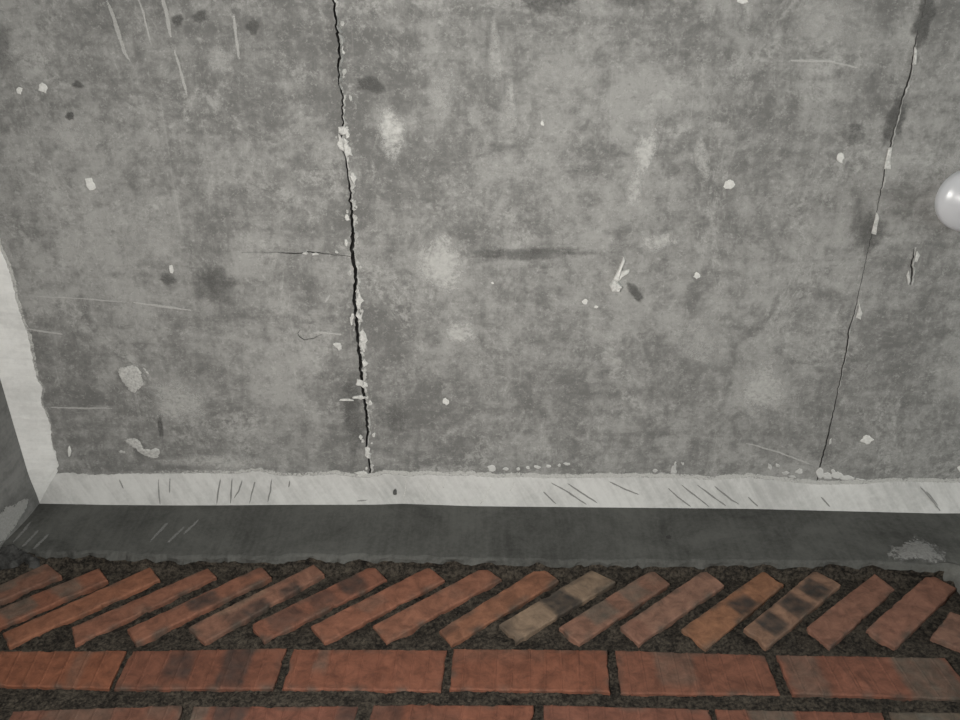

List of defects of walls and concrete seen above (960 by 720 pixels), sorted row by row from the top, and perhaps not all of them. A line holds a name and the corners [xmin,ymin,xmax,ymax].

crack [242,0,375,477]